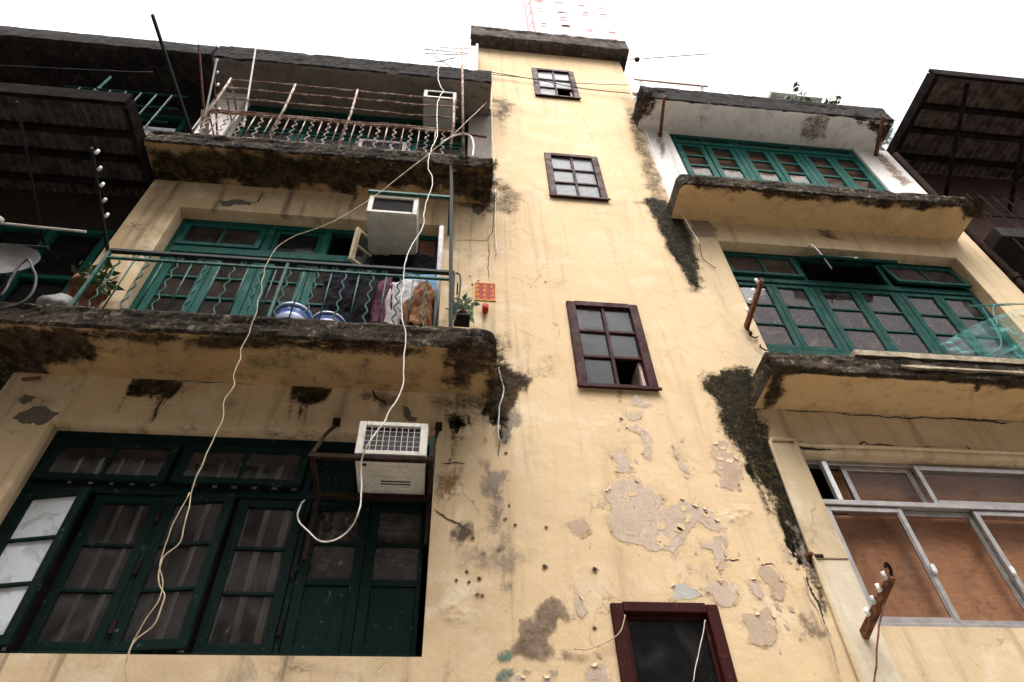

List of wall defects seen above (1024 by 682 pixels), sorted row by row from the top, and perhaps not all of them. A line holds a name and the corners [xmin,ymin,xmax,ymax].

leakage [146,145,498,216]
leakage [0,324,426,374]
spalling [12,394,60,426]
leakage [119,378,183,407]
leakage [289,386,332,422]
leakage [445,414,464,461]
leakage [439,334,532,444]
crack [760,408,1017,424]
leakage [472,461,516,585]
peeling [600,411,799,654]
leakage [748,467,827,613]
leakage [496,596,584,681]